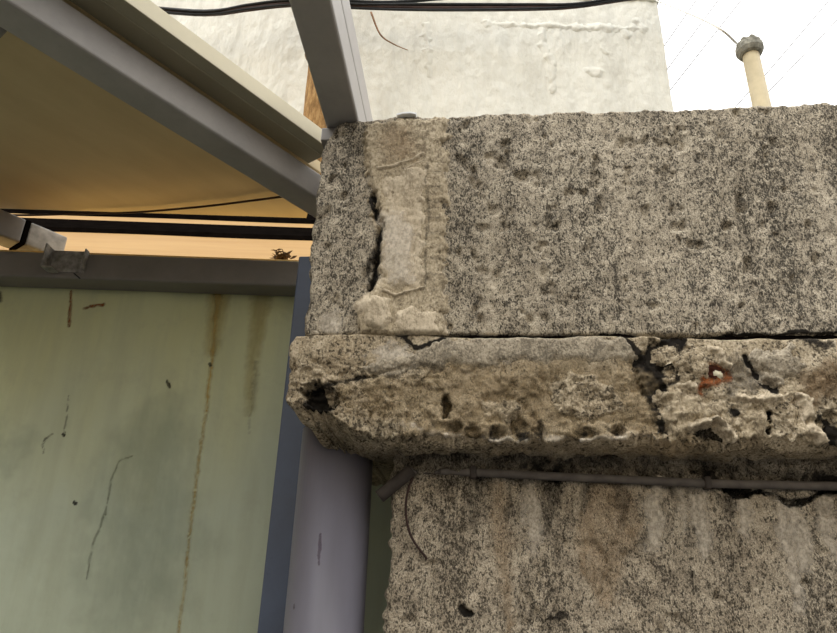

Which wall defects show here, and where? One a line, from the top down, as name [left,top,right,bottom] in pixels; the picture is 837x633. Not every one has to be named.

crack [365,193,386,292]
crack [396,332,636,350]
crack [712,329,837,340]
spalling [302,336,837,447]
corrosion [698,364,732,395]